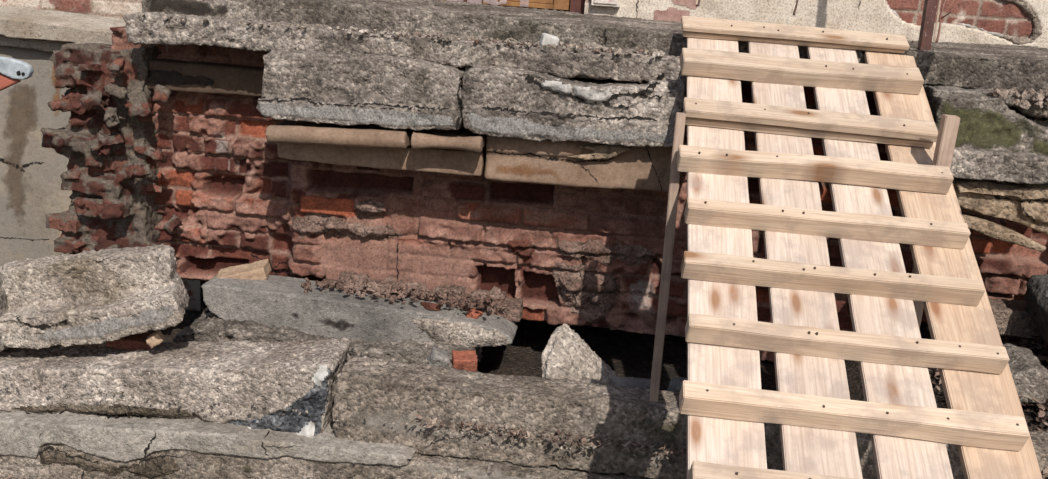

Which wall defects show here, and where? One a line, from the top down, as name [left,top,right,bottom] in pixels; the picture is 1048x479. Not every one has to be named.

flaking render [885,0,924,26]
flaking render [935,0,1043,45]
crack [258,64,664,128]
damp [5,86,35,214]
crack [487,151,616,182]
crack [97,413,164,457]